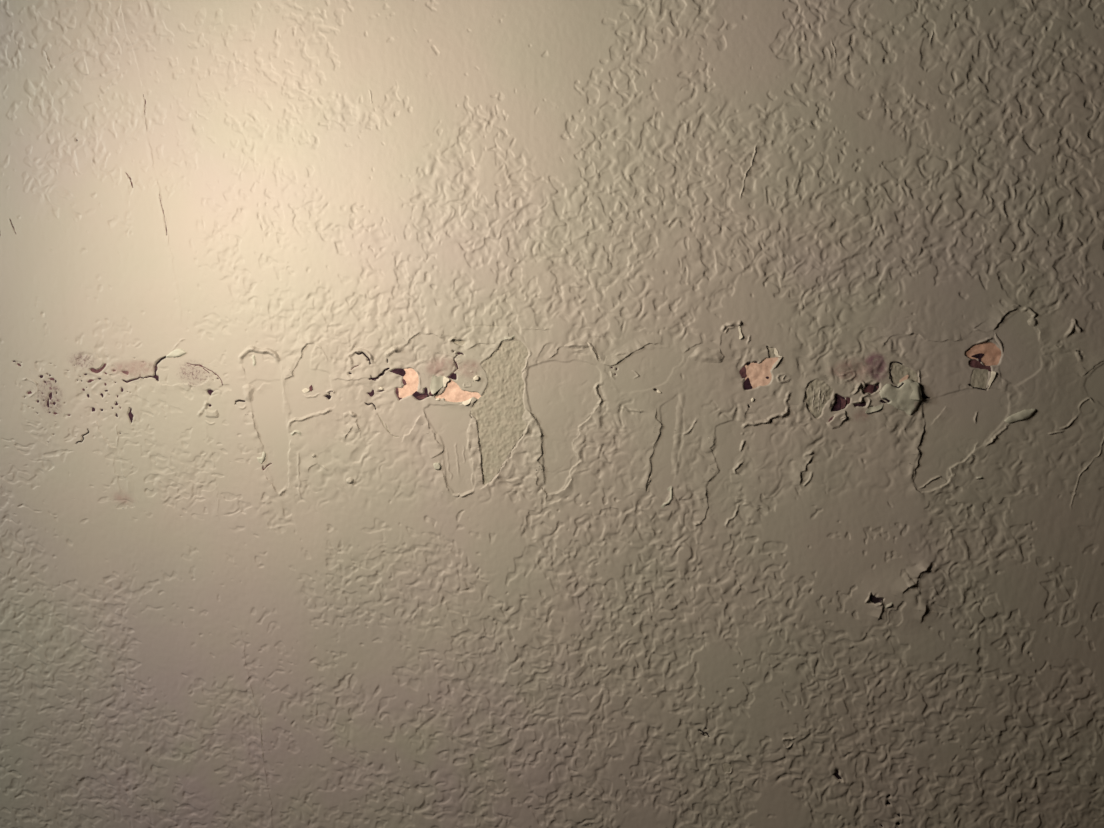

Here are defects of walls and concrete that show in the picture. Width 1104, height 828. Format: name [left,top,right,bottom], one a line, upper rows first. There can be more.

crack [120,0,223,392]
peeling [237,335,328,409]
peeling [302,385,335,399]
peeling [368,325,481,409]
peeling [600,335,664,380]
peeling [716,320,751,346]
peeling [739,346,783,390]
peeling [826,362,930,429]
peeling [965,301,1084,390]
peeling [618,406,662,492]